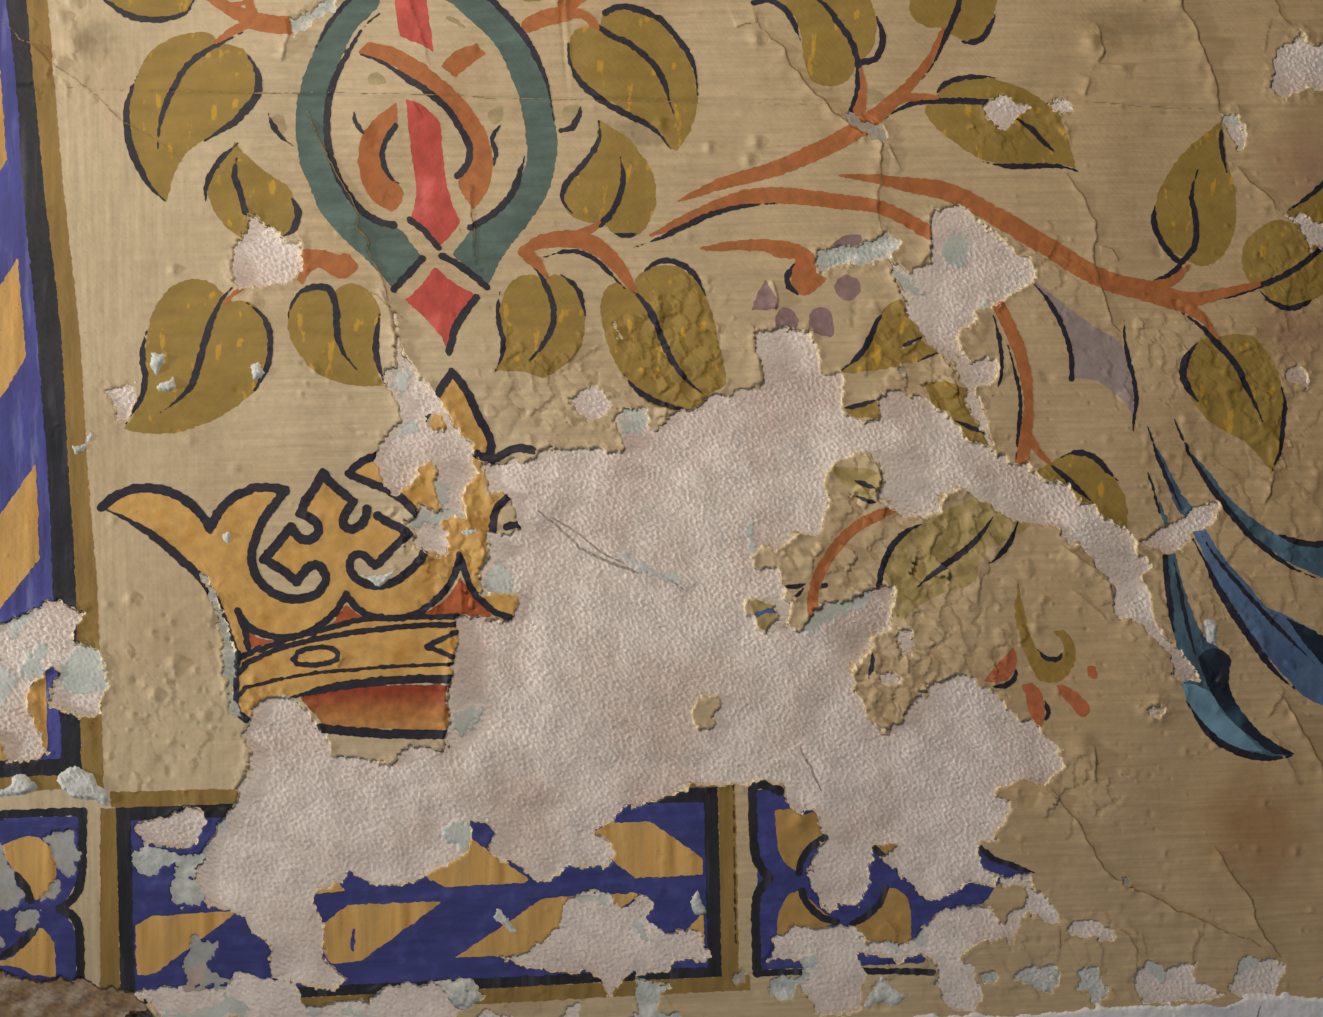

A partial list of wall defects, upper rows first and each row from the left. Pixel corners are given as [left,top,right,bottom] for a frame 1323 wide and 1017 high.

crack [1084,1,1222,118]
peeling [1270,29,1323,102]
crack [1237,166,1274,201]
peeling [0,203,1221,1017]
crack [1278,693,1323,769]
crack [1050,786,1281,959]